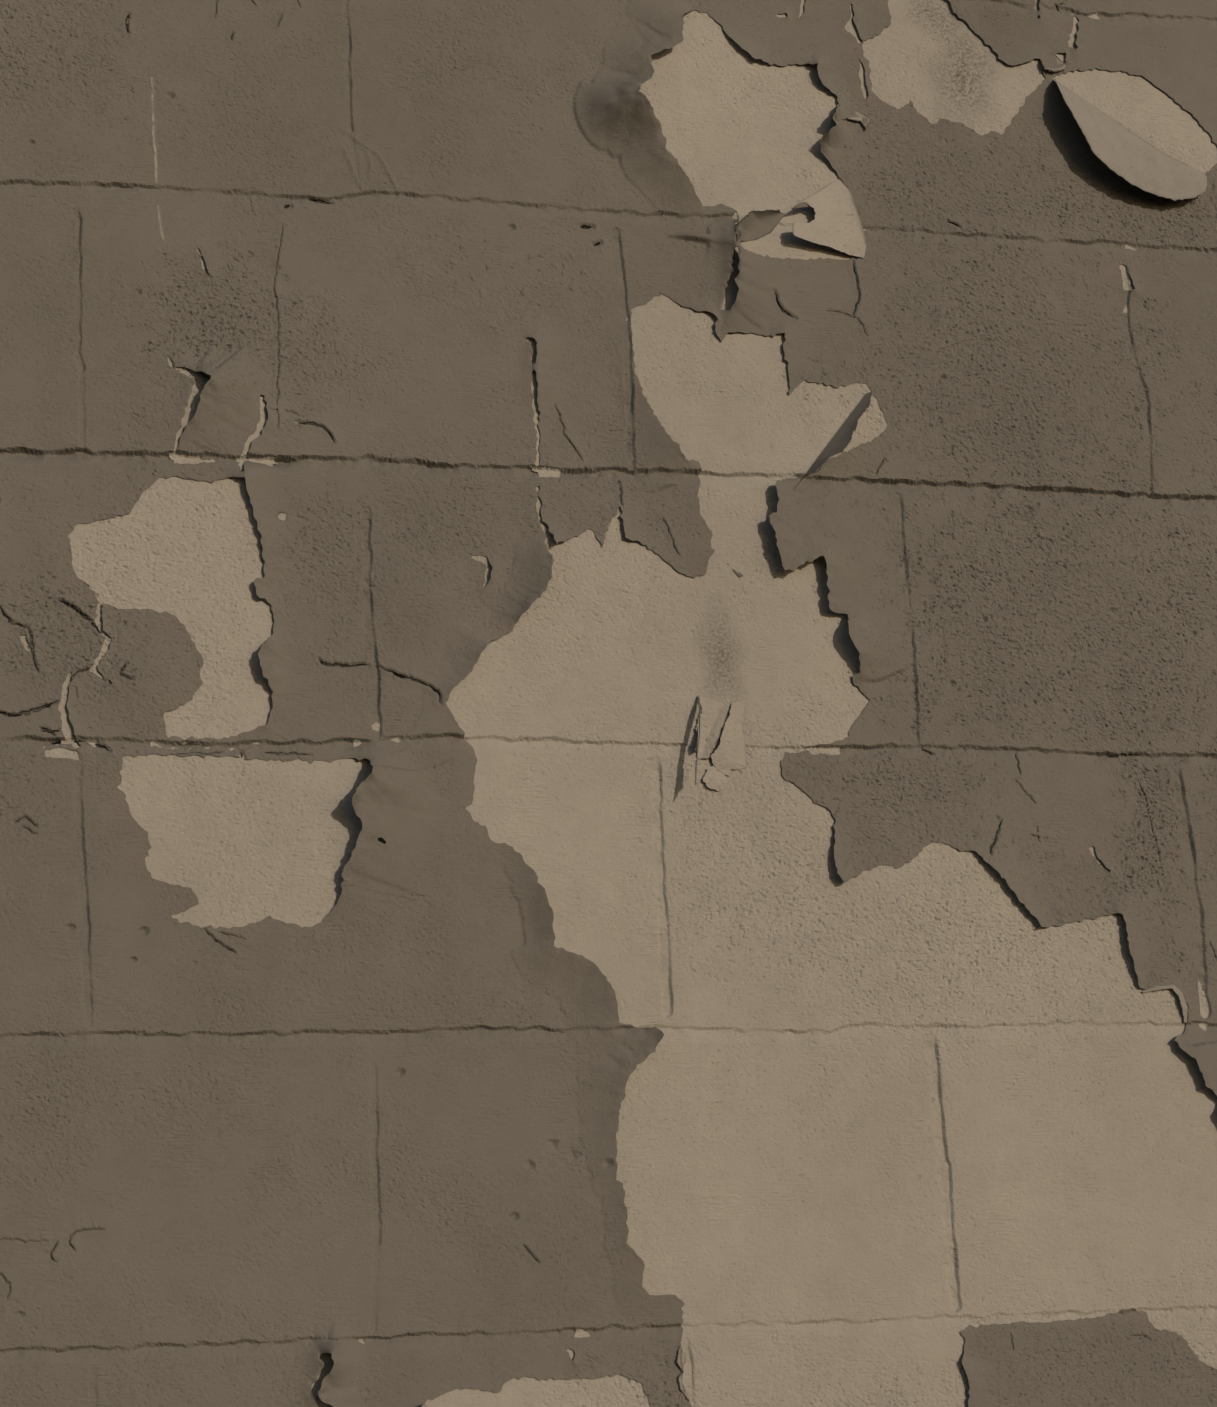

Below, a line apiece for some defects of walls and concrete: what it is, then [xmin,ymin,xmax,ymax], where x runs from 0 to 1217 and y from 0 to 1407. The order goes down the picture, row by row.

crack [0,606,38,670]
crack [59,600,101,633]
peeling [68,344,444,929]
crack [0,663,131,751]
peeling [413,0,1217,1407]
crack [171,751,311,759]
crack [0,1229,103,1262]
peeling [297,1323,364,1407]